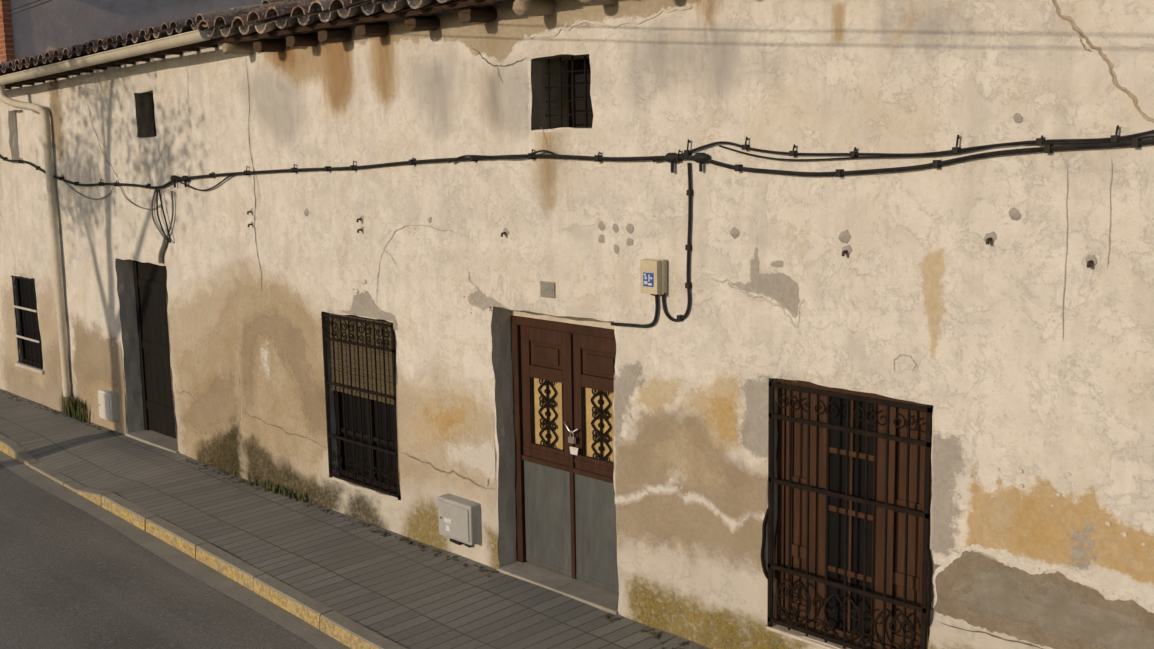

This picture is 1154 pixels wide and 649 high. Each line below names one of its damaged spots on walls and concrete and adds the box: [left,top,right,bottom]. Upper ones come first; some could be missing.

crack [1052,0,1154,122]
spalling [343,279,397,330]
spalling [710,239,805,329]
damp [168,272,383,529]
damp [396,386,495,485]
peeling [614,362,780,458]
spalling [930,434,1154,649]